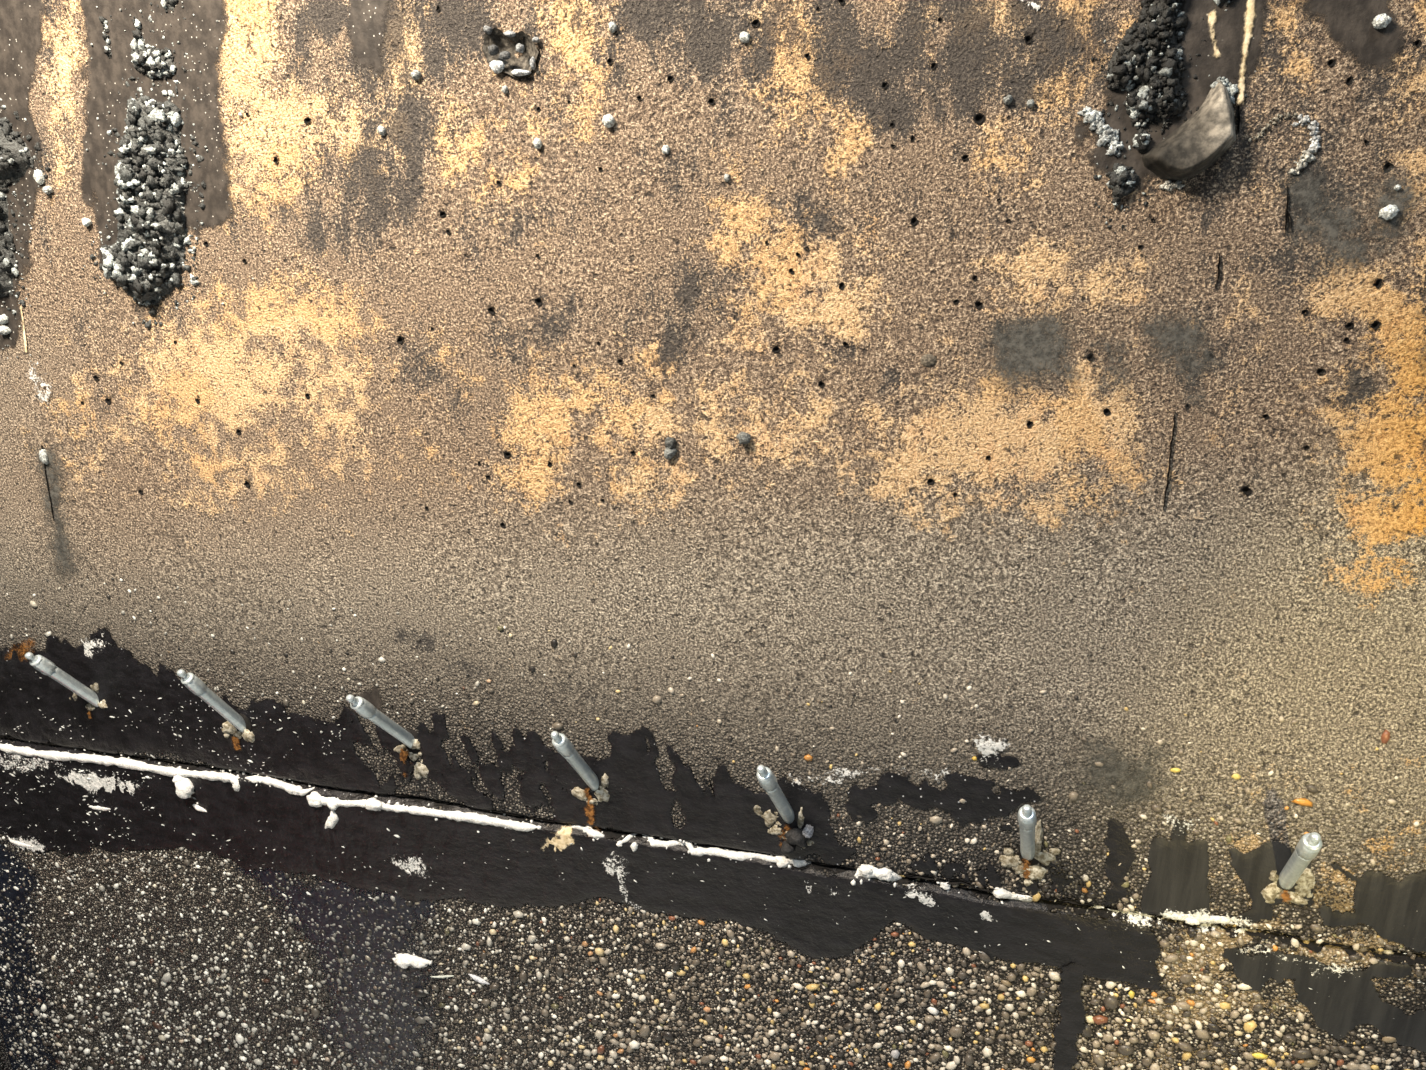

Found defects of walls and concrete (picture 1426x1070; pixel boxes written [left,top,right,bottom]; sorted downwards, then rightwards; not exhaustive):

corrosion [584,788,601,832]
crack [0,736,1426,965]